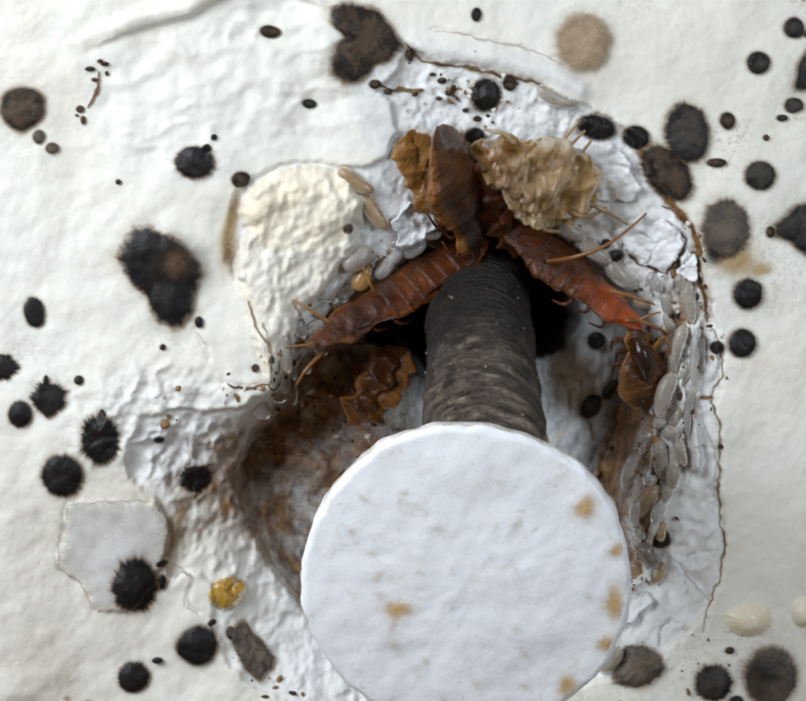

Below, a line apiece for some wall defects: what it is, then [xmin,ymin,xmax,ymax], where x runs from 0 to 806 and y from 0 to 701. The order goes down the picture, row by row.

peeling [69,0,377,186]
leakage [369,80,393,95]
leakage [430,72,456,101]
spalling [126,48,724,701]
peeling [63,502,165,607]